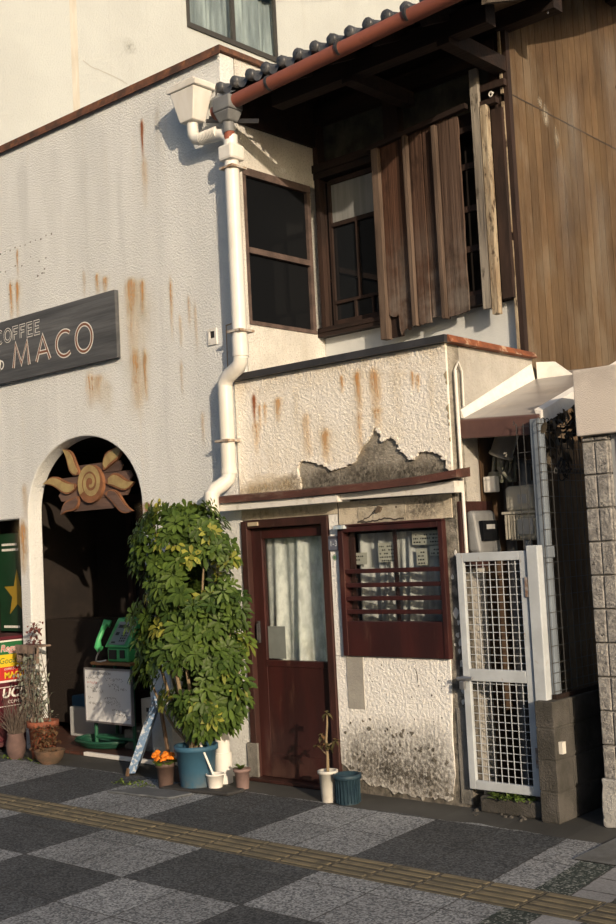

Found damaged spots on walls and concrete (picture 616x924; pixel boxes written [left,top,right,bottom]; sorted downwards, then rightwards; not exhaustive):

corrosion [127,280,143,310]
flaking render [296,425,450,489]